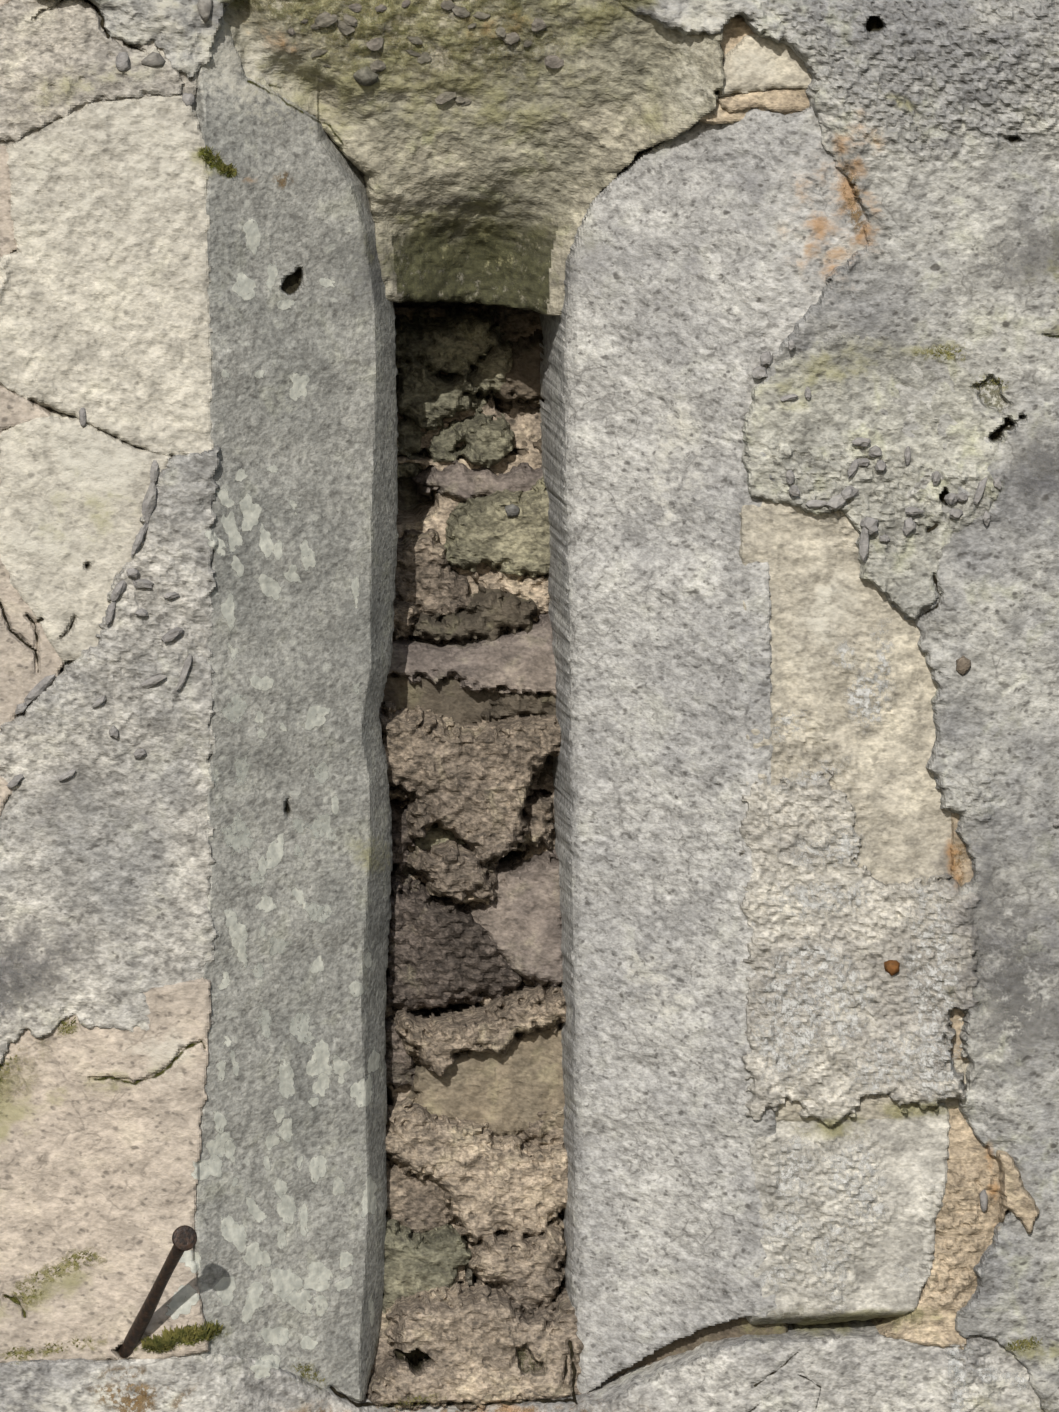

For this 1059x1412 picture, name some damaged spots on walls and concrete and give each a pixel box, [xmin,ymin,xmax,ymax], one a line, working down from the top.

crack [39,0,144,52]
spalling [112,37,165,56]
water stain [287,0,411,73]
water stain [441,0,547,48]
spalling [0,98,125,147]
spalling [179,72,198,109]
water stain [435,92,472,106]
peeling [79,407,87,427]
peeling [781,387,811,402]
peeling [105,460,180,625]
peeling [15,674,55,714]
spalling [739,437,1040,1350]